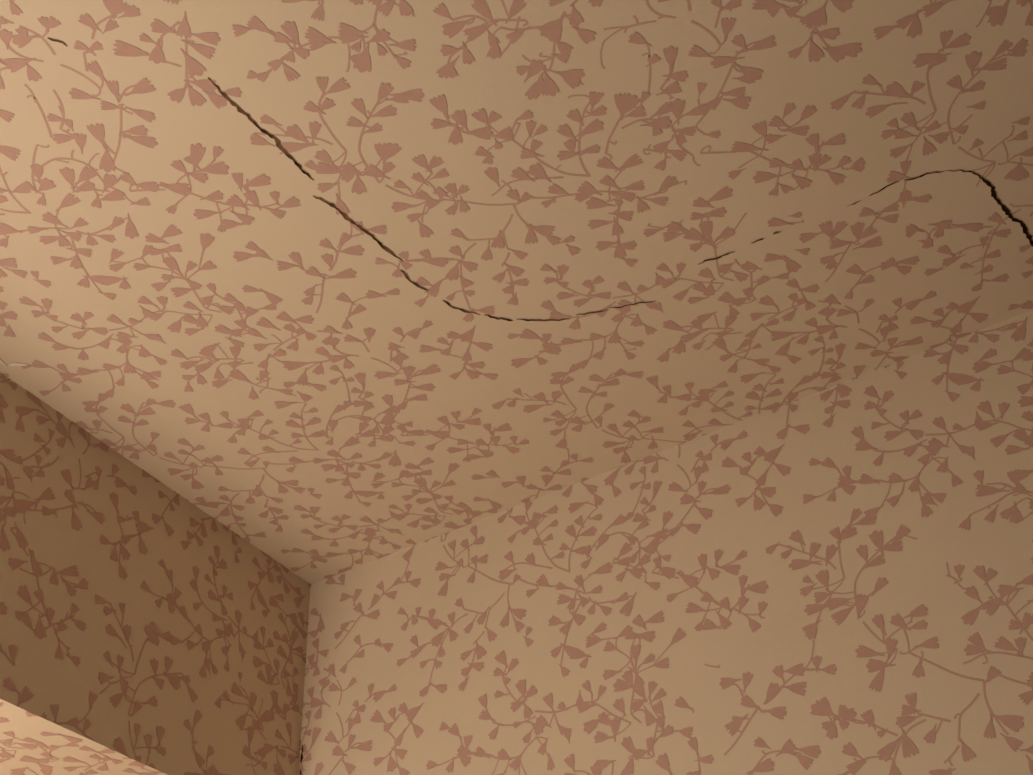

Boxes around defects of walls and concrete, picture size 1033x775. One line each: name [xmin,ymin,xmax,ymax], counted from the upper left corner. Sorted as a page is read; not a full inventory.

crack [208,78,655,321]
crack [849,170,1033,247]
crack [698,231,781,265]